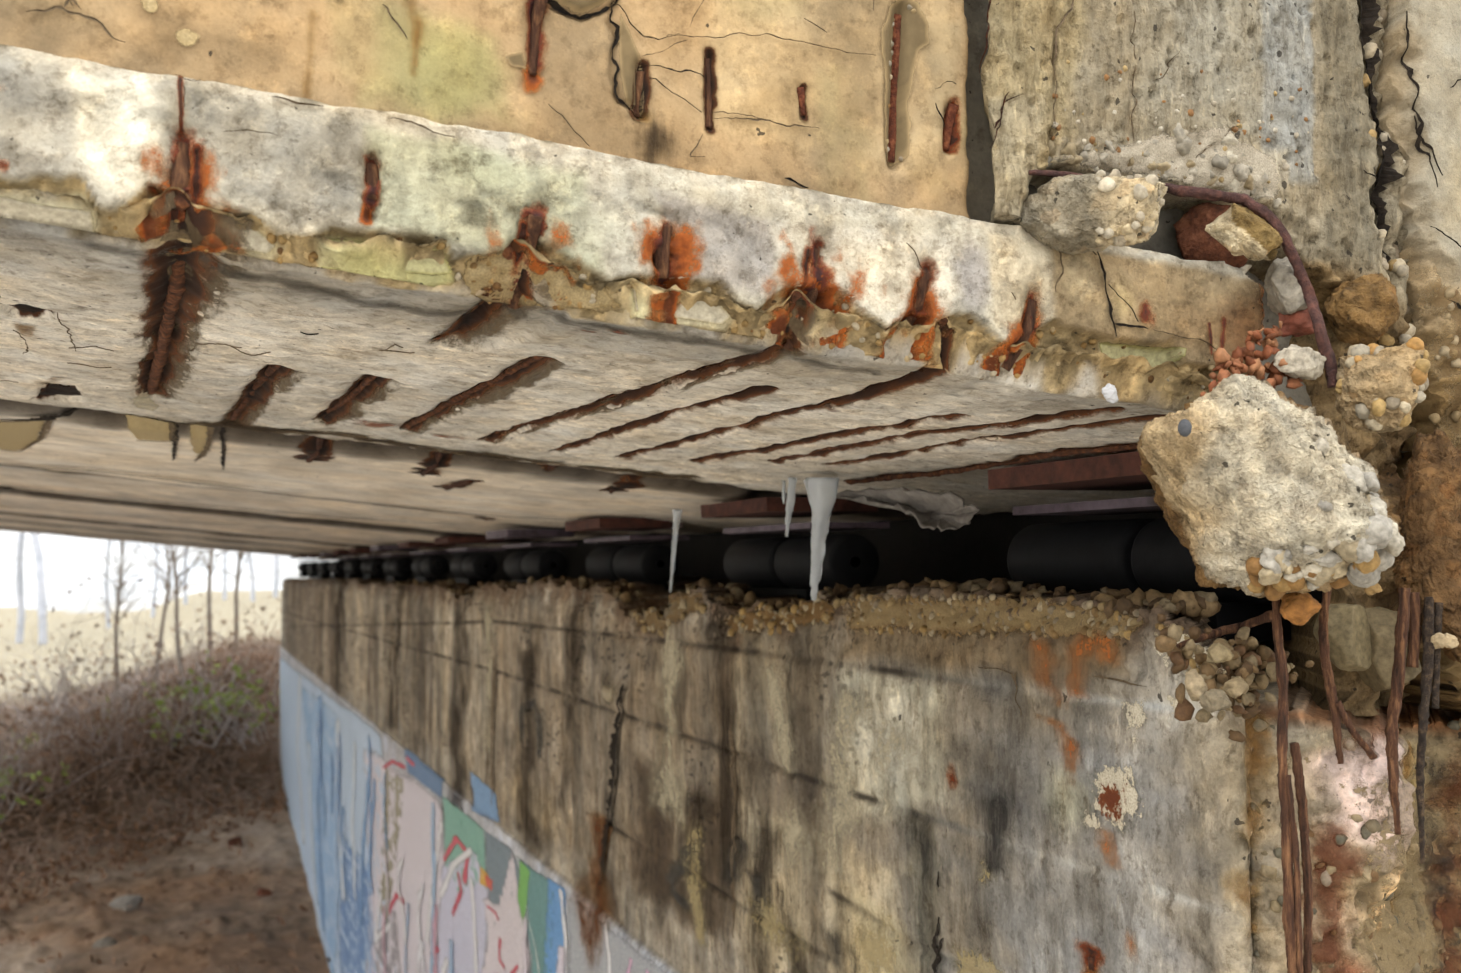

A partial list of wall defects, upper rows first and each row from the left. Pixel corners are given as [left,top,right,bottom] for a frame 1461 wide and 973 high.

spalling [8,304,76,351]
spalling [33,377,81,399]
rust [135,76,241,254]
spalling [96,190,1166,494]
rust [634,219,704,325]
crack [609,0,873,157]
rust [763,228,865,351]
crack [1357,0,1461,347]
spalling [723,73,1461,973]
damp [515,648,570,849]
damp [652,626,706,949]
damp [716,692,869,973]